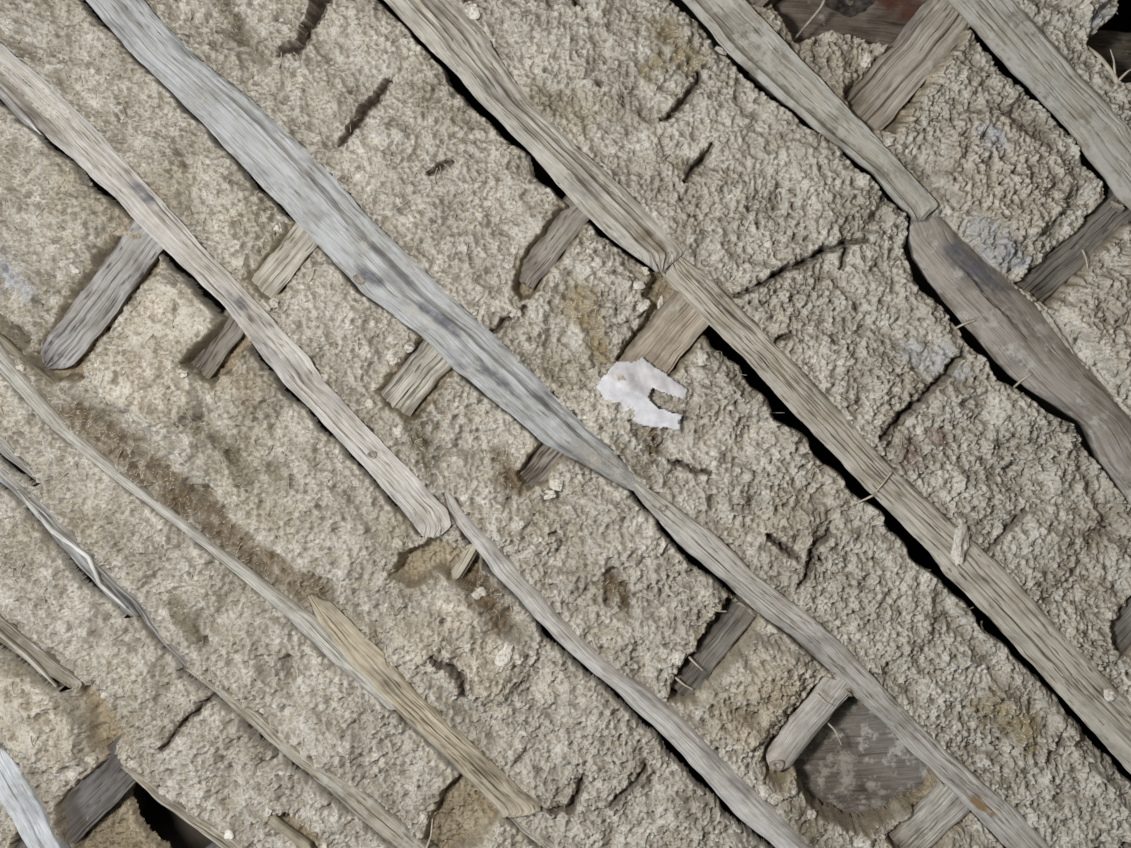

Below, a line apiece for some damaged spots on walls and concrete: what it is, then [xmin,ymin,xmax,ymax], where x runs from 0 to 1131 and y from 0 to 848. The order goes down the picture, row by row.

spalling [746,0,889,109]
spalling [871,27,975,147]
spalling [1081,0,1131,92]
spalling [45,673,201,848]
spalling [753,662,944,848]
spalling [930,811,980,848]